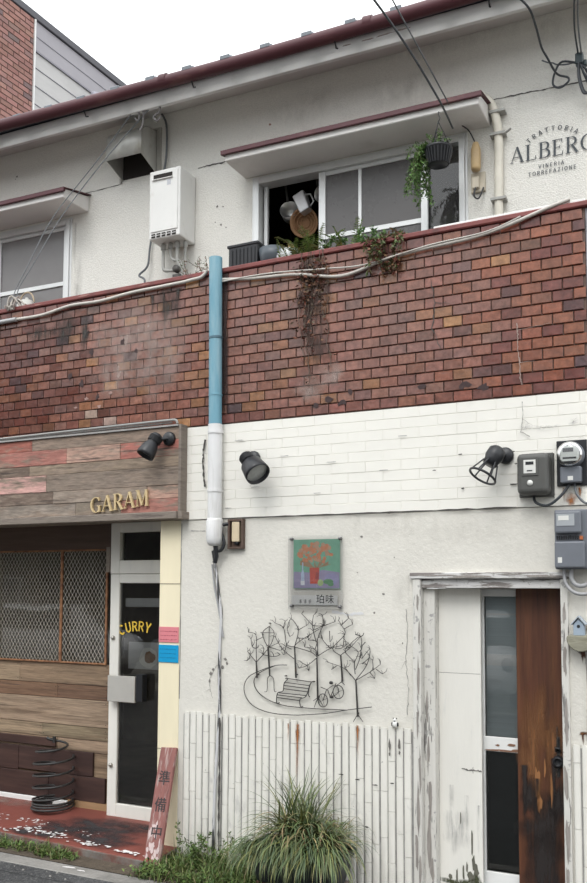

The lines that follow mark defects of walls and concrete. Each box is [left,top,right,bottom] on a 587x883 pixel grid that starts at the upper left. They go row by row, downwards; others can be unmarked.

peeling [415,664,434,883]
peeling [449,831,479,883]